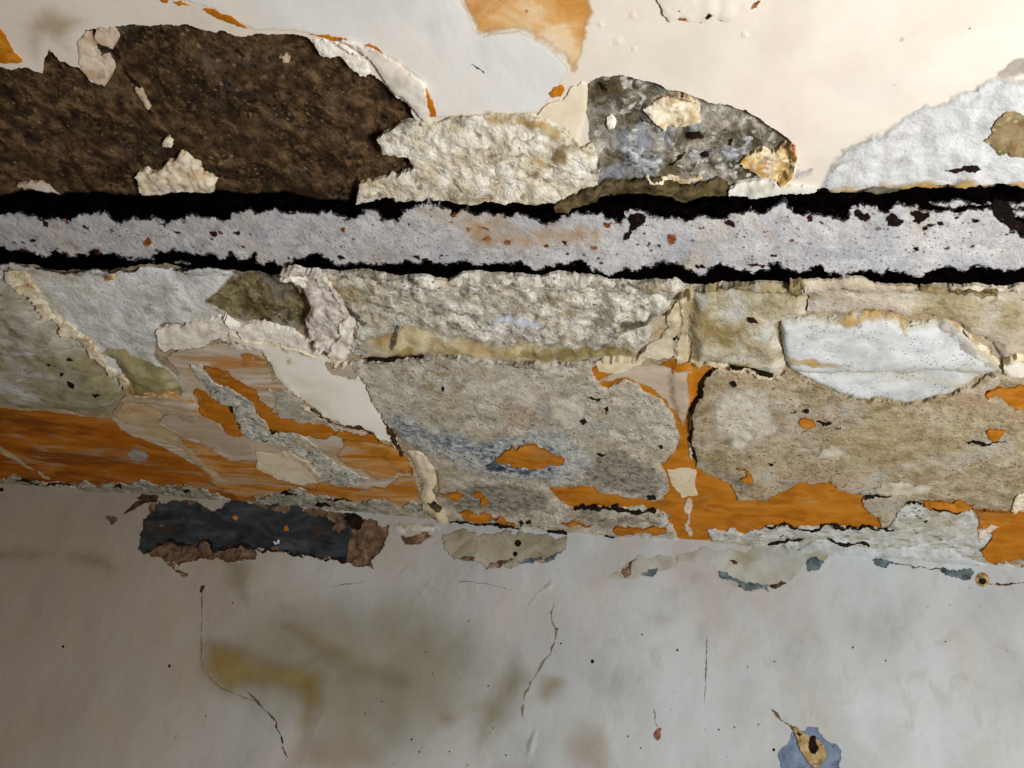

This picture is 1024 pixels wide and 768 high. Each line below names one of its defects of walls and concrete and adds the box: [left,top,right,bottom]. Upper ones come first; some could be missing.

spalling [0,0,817,215]
spalling [984,111,1024,158]
peeling [929,198,991,211]
peeling [1006,200,1024,219]
spalling [0,259,1024,592]
crack [167,562,288,758]
crack [521,603,557,722]
peeling [778,727,842,768]